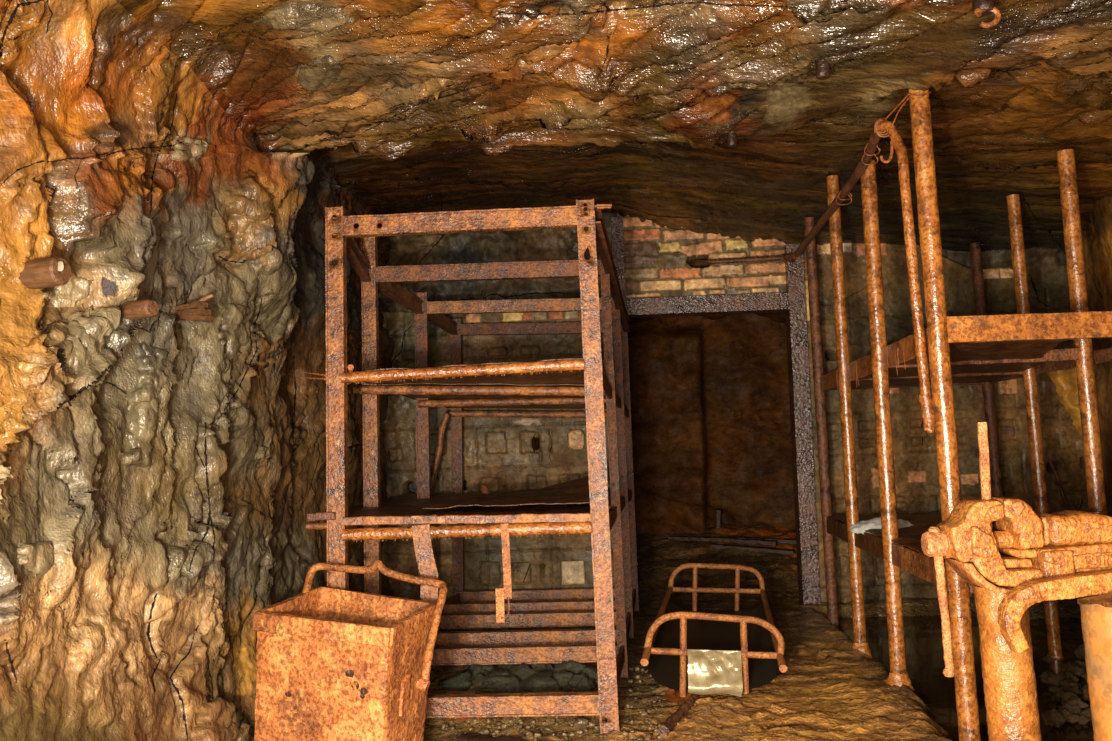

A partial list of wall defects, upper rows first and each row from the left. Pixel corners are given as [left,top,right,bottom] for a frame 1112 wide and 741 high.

crack [57,365,127,410]
crack [189,298,262,571]
crack [146,593,214,741]